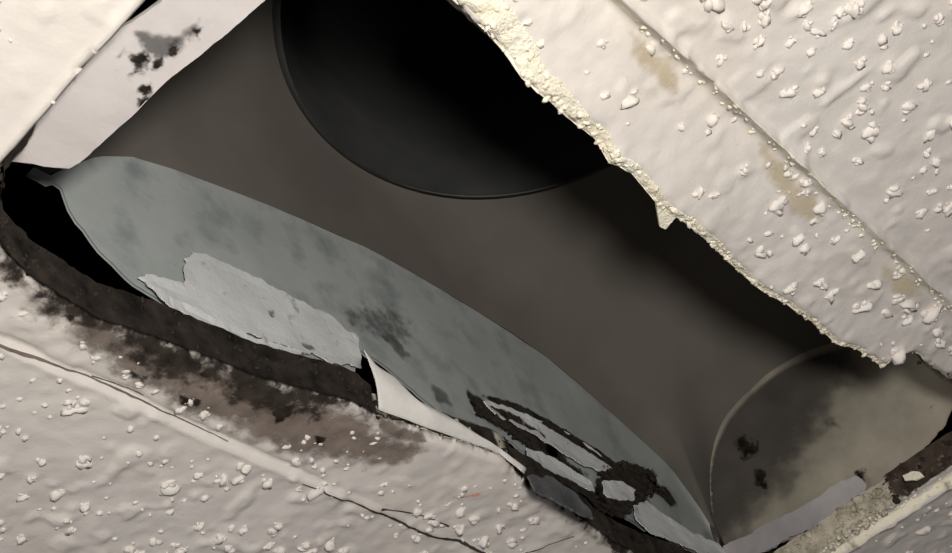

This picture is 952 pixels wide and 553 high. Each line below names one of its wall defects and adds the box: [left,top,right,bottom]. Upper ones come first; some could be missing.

spalling [453,0,891,368]
peeling [138,252,362,369]
peeling [483,400,896,553]
peeling [902,471,924,481]